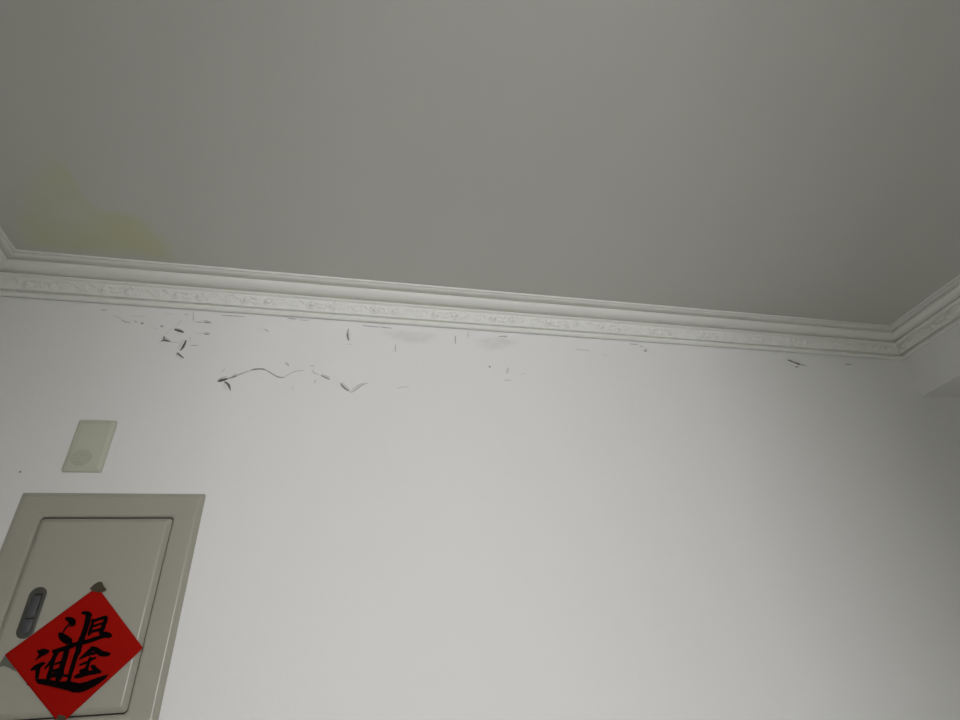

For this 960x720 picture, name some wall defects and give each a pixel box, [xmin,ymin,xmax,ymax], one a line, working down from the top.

crack [217,362,367,393]